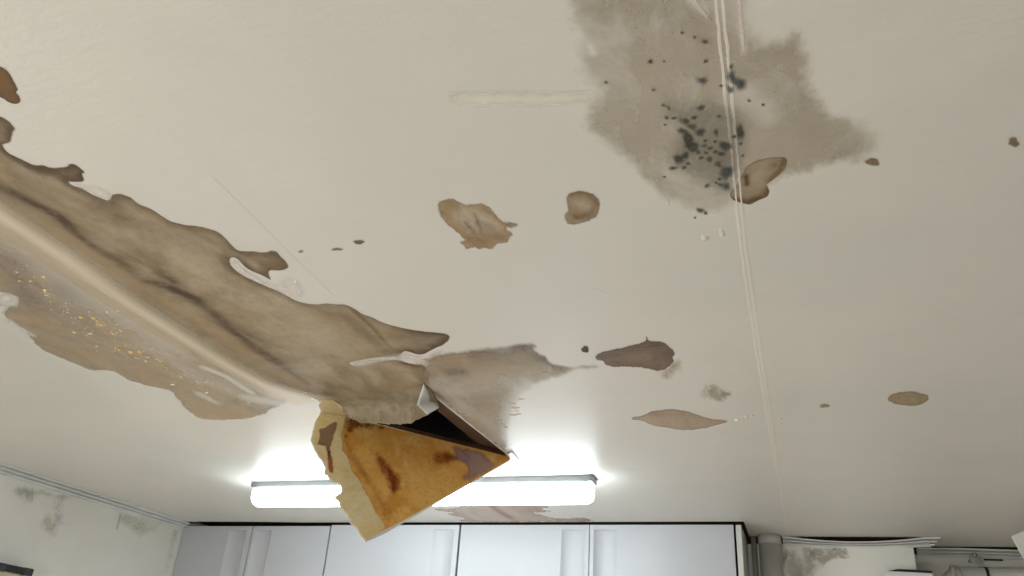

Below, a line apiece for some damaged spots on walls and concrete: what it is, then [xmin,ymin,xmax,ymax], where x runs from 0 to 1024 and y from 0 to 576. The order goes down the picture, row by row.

mould [720,66,744,92]
mould [662,105,744,189]
leakage [565,191,600,224]
leakage [0,117,568,449]
peeling [336,384,439,425]